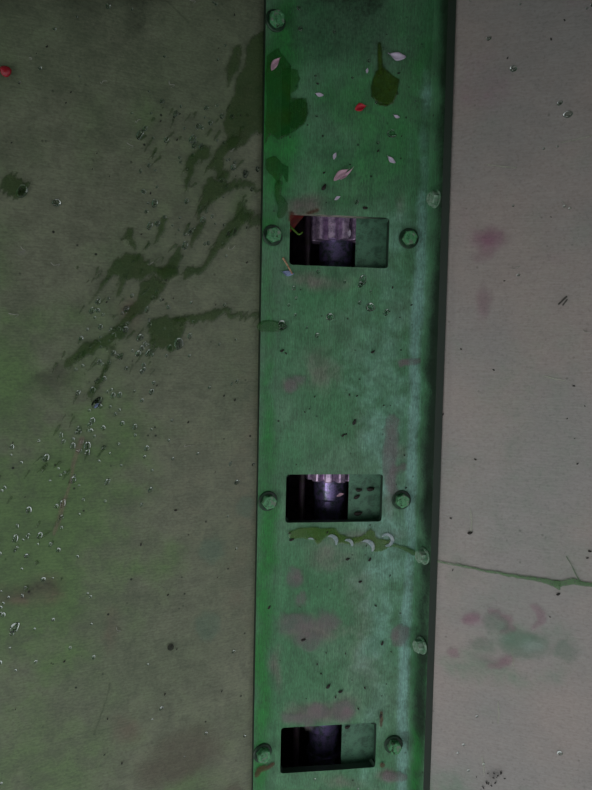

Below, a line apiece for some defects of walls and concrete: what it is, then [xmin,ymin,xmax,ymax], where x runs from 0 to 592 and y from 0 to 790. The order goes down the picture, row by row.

water stain [53,32,308,401]
water stain [289,527,415,555]